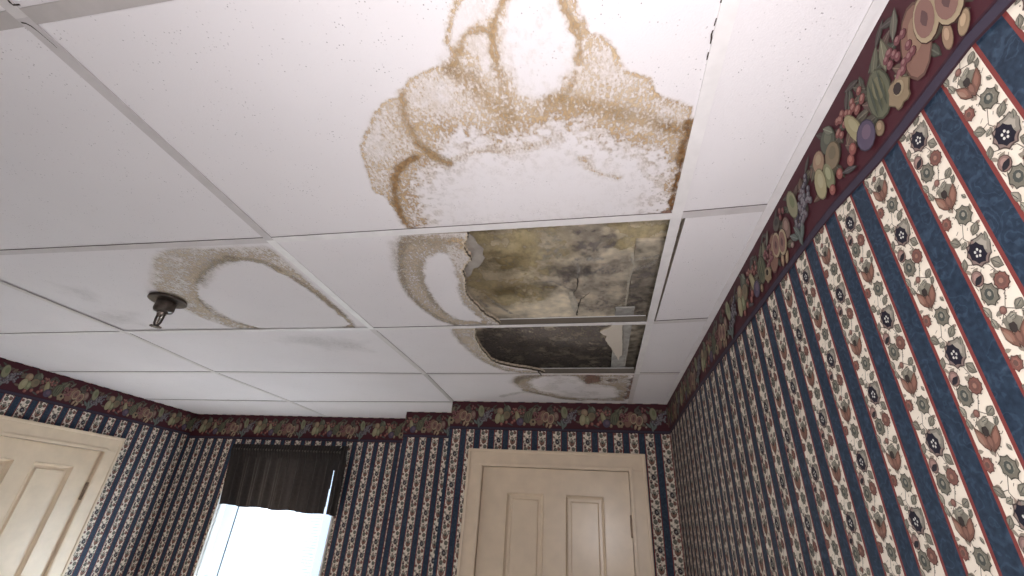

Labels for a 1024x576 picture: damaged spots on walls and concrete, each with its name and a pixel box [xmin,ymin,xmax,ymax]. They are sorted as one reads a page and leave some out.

water stain [361,0,694,401]
water stain [155,249,355,328]
spalling [600,325,623,360]